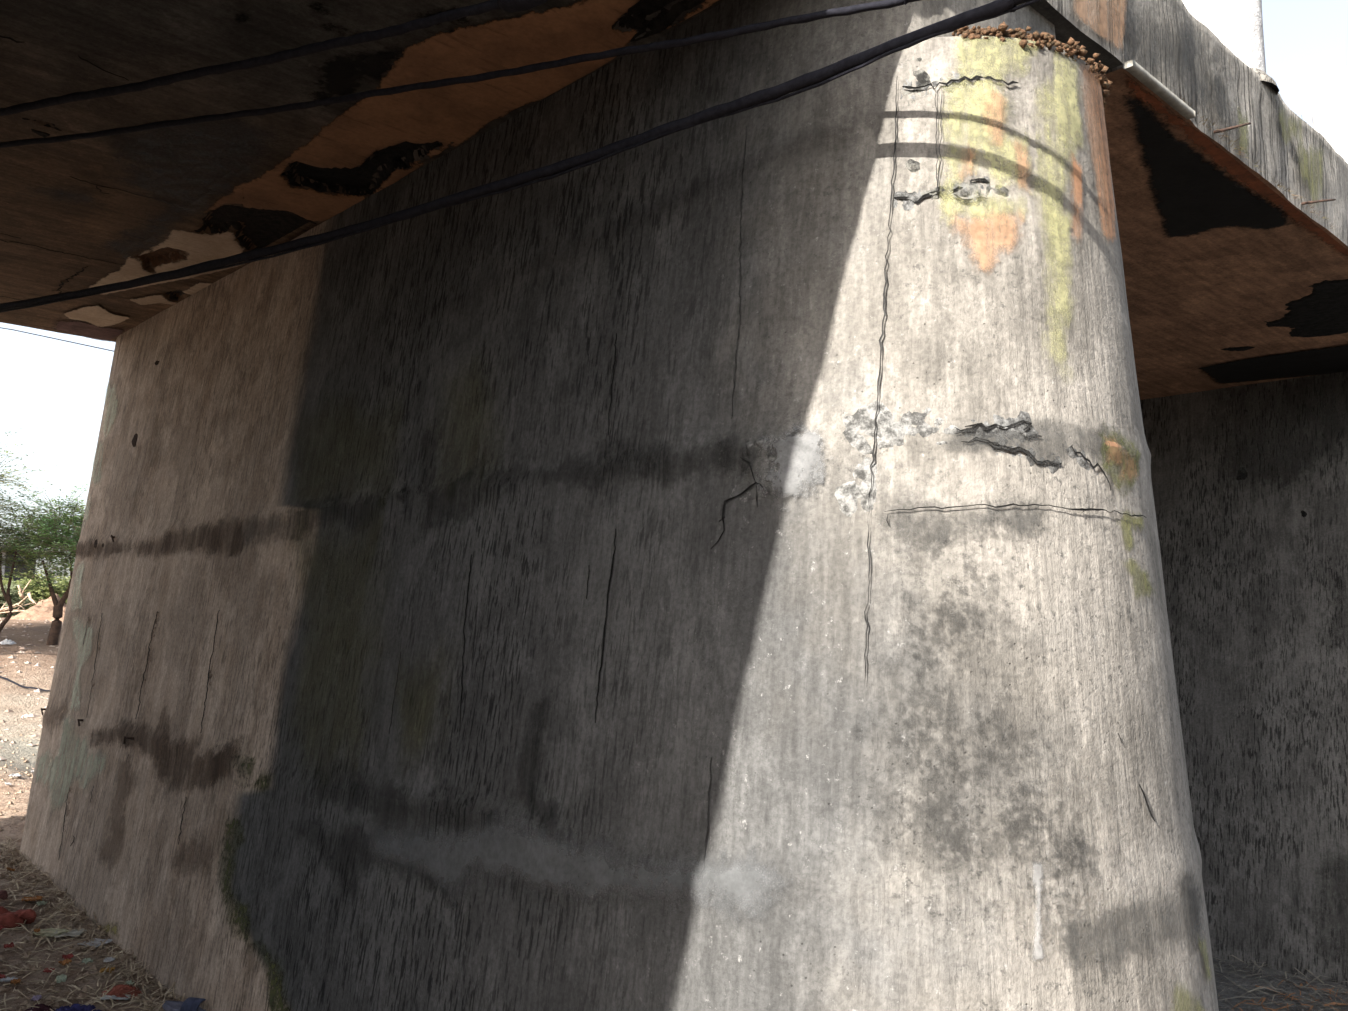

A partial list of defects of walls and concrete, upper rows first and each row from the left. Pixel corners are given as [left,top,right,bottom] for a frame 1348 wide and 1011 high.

spalling [901,57,931,95]
peeling [64,0,719,327]
crack [893,170,991,211]
rust [1073,71,1116,239]
rust [1126,74,1348,256]
spalling [1265,279,1348,337]
crack [711,457,774,549]
spalling [810,401,959,517]
crack [885,411,1147,525]
damp [36,705,231,803]
damp [1033,864,1043,959]
damp [1063,885,1200,962]